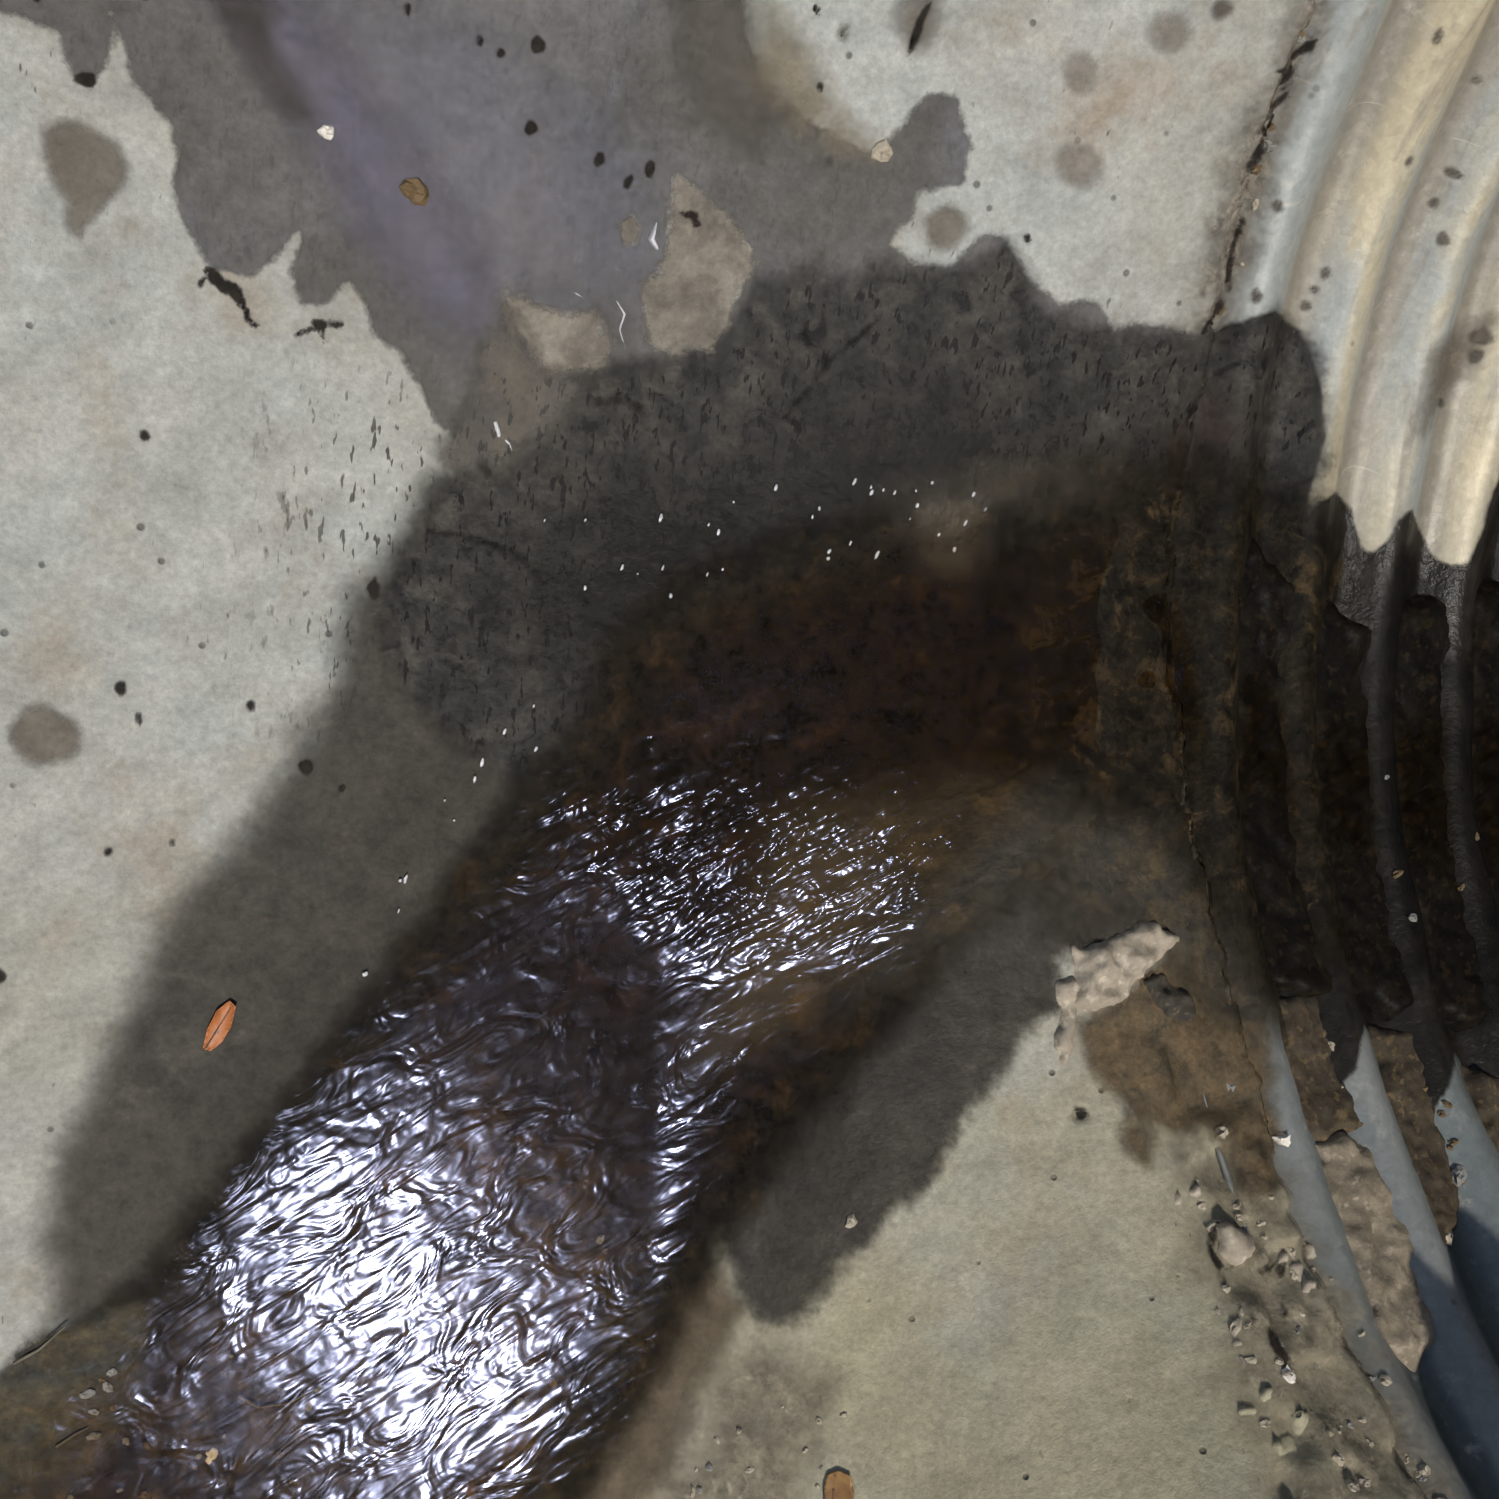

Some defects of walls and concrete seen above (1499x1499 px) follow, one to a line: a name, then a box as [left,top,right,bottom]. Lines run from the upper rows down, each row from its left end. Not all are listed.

crack [1202,39,1318,335]
water stain [0,0,1328,1328]
water stain [1312,484,1499,669]
water stain [584,848,1139,1499]
spalling [1053,921,1180,1066]
spalling [1174,1133,1453,1499]
water stain [1316,942,1499,1110]